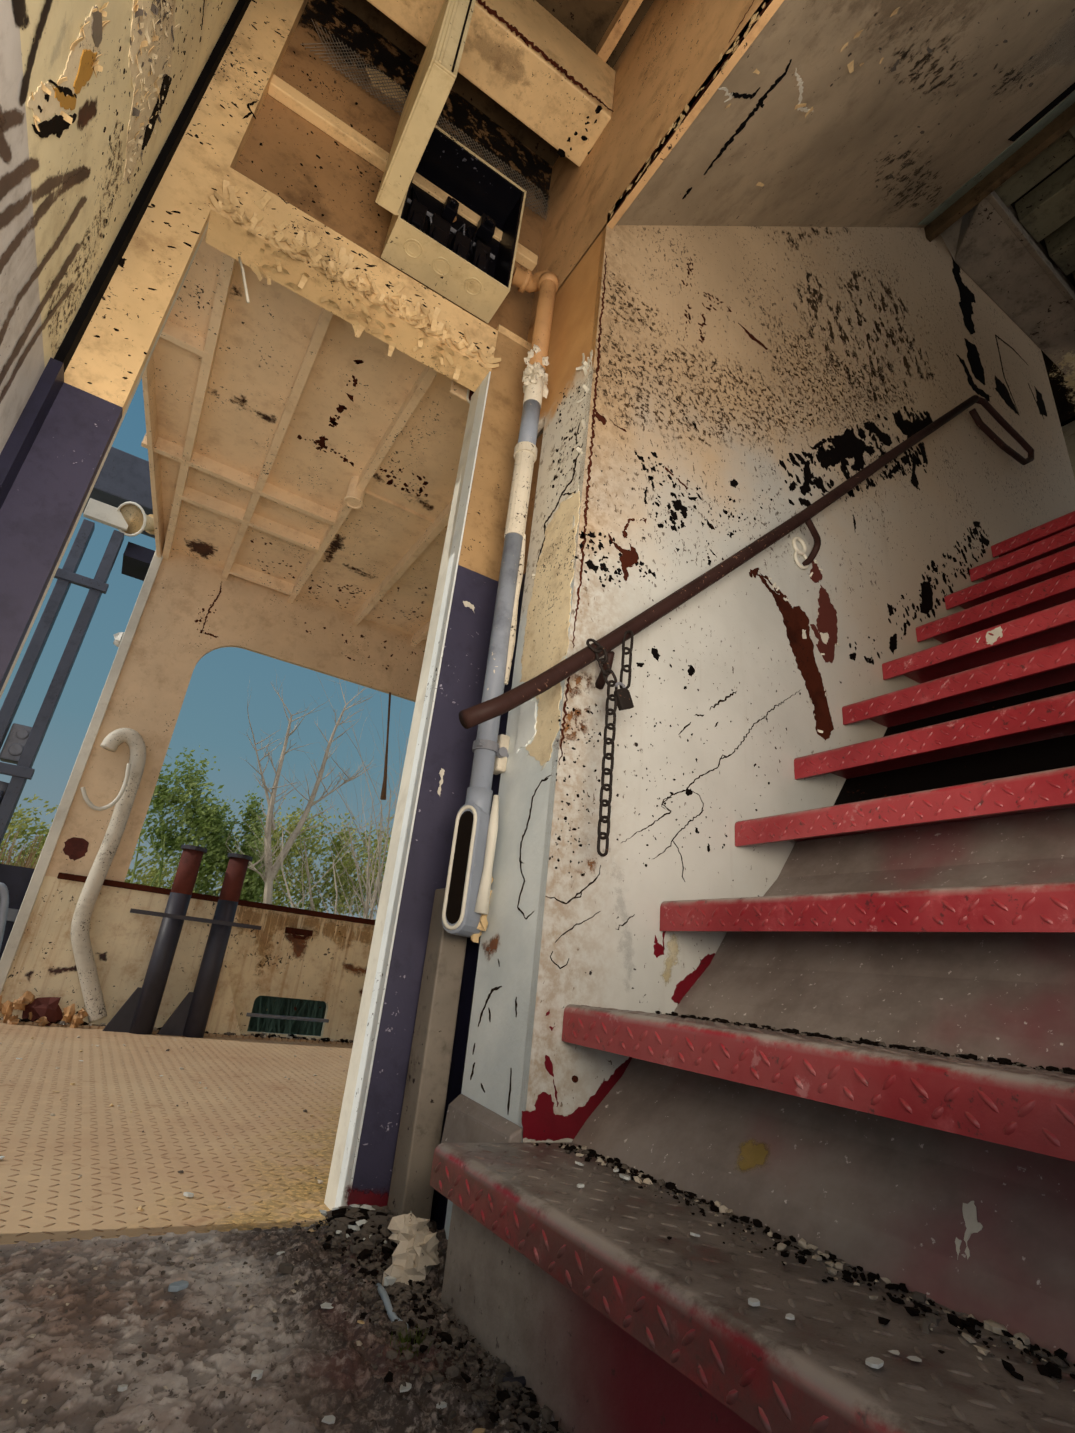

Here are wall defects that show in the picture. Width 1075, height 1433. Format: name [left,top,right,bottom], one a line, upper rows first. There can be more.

spalling [27,0,222,250]
spalling [226,0,391,151]
peeling [362,66,406,111]
crack [611,0,813,218]
peeling [133,141,501,380]
spalling [635,406,933,565]
corrosion [63,837,89,861]
crack [517,690,800,969]
peeling [955,1201,983,1260]